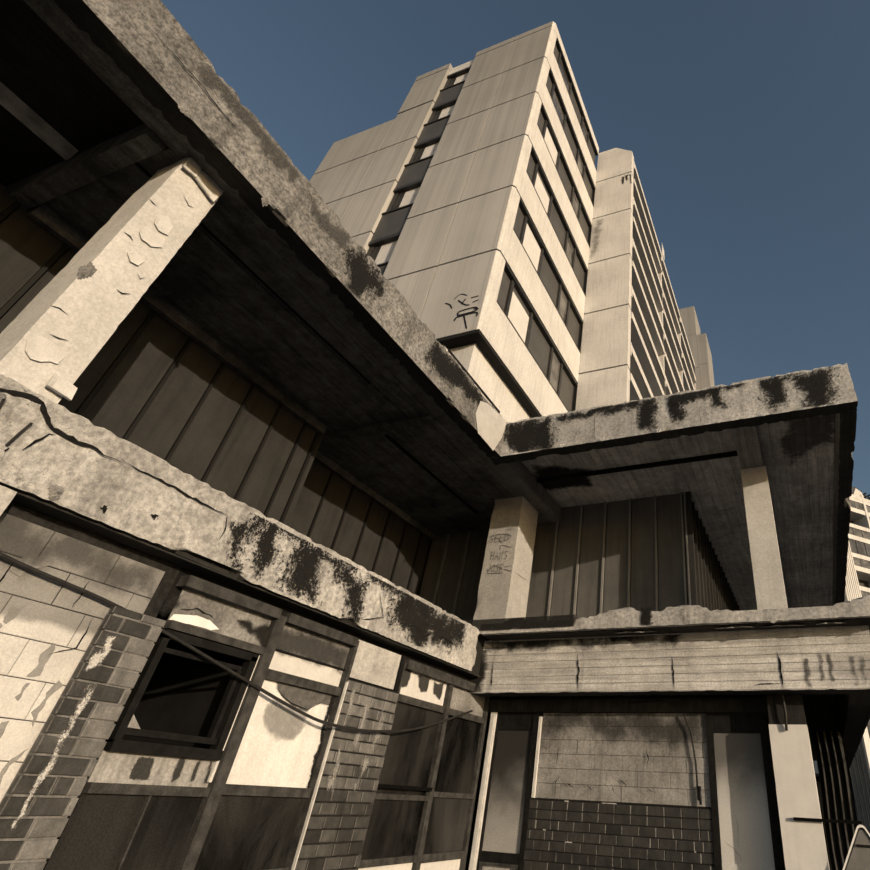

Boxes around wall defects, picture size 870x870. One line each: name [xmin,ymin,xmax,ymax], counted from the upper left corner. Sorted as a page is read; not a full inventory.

spalling [77,262,97,279]
peeling [139,215,173,248]
damp [307,194,385,300]
spalling [5,422,33,446]
flaking render [45,375,78,401]
crack [0,388,228,538]
damp [504,366,845,466]
damp [224,513,576,655]
damp [86,636,115,670]
damp [401,670,444,700]
damp [470,606,681,692]
damp [11,689,92,828]